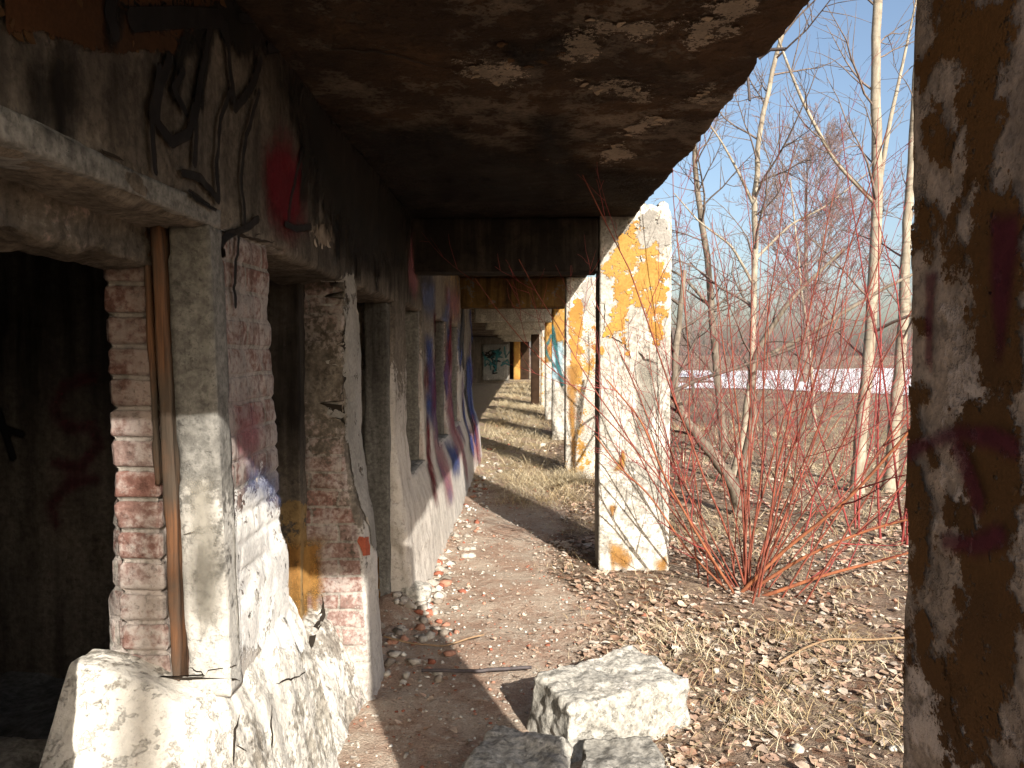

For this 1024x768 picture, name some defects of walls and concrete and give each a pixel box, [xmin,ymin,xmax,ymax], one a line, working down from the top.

peeling [451,52,531,90]
peeling [553,0,761,165]
peeling [553,208,671,385]
peeling [902,0,1024,768]
crack [276,594,326,684]